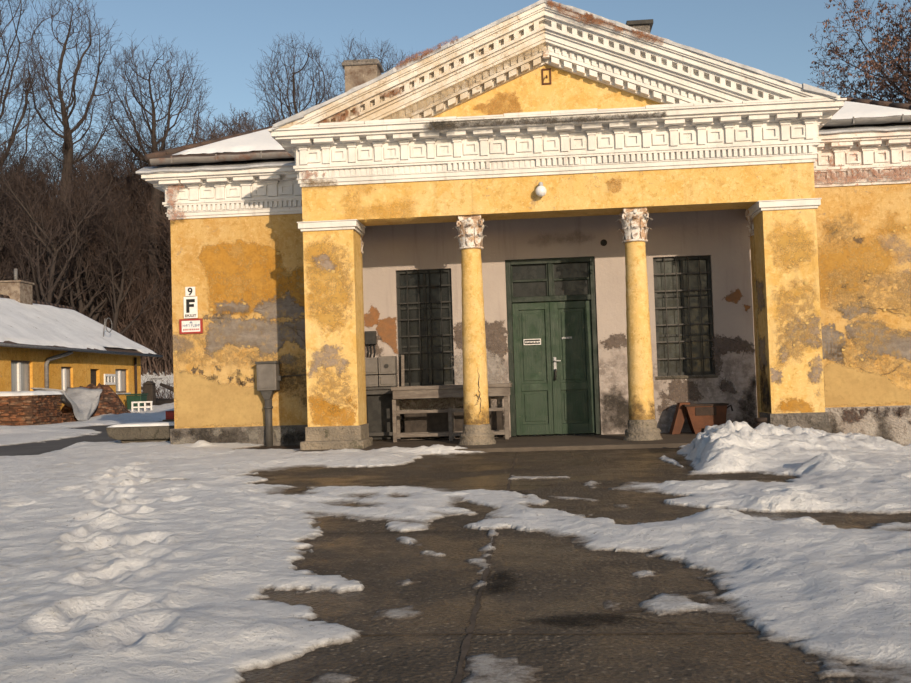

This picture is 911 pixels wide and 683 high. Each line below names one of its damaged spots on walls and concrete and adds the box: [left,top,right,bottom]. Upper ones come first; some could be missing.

peeling [175,239,353,409]
peeling [364,305,398,358]
spalling [453,322,463,385]
spalling [485,320,510,384]
spalling [600,333,627,350]
peeling [711,215,911,394]
leakage [601,393,629,430]
leakage [739,365,814,429]
spalling [840,406,911,424]